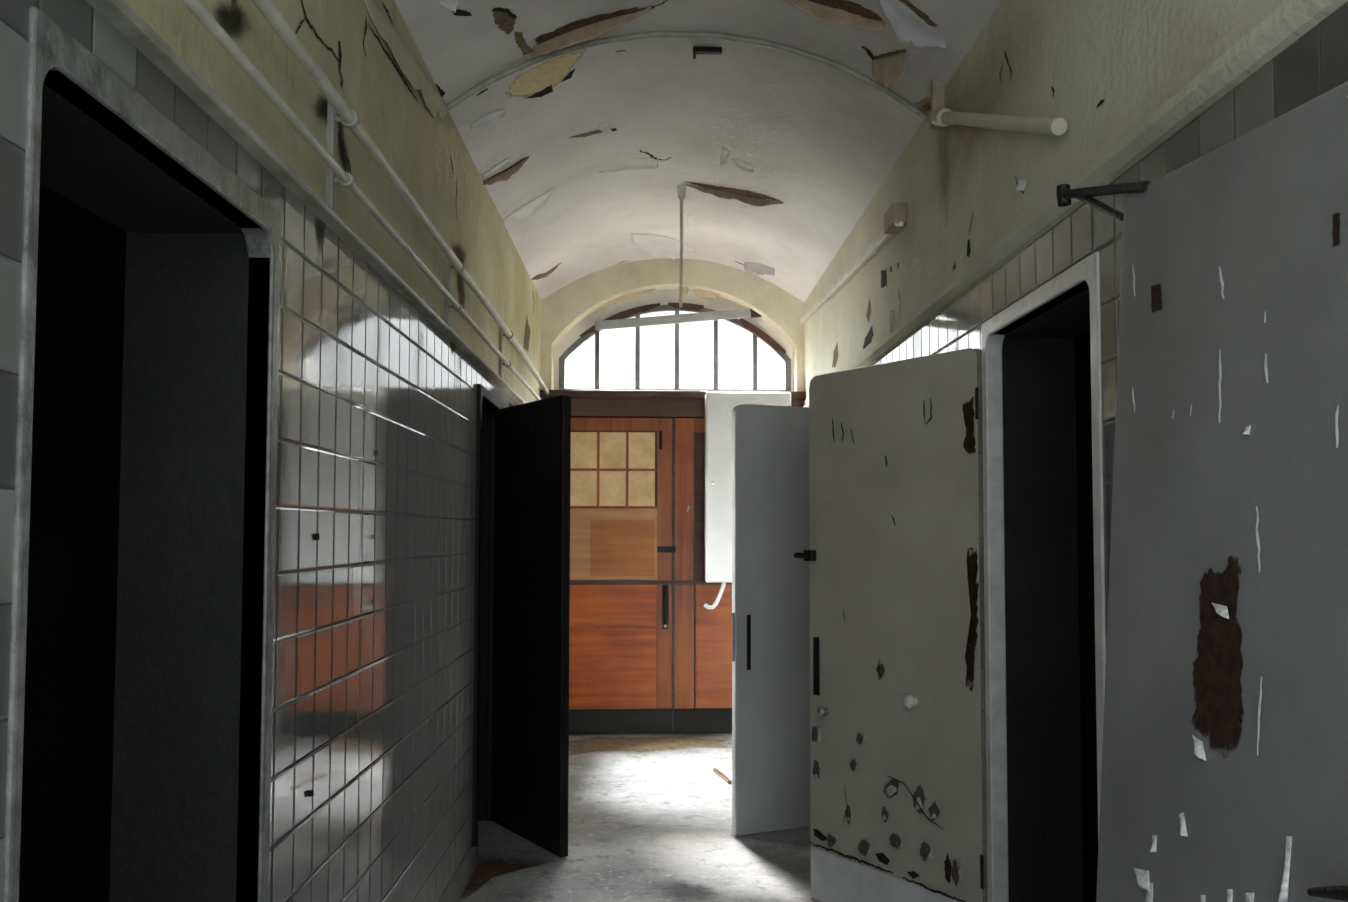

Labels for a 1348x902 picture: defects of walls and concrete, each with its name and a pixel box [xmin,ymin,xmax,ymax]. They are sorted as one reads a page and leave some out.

crack [295,0,393,89]
peeling [492,0,668,99]
peeling [781,0,947,90]
peeling [483,157,529,185]
peeling [568,122,617,138]
peeling [686,182,783,207]